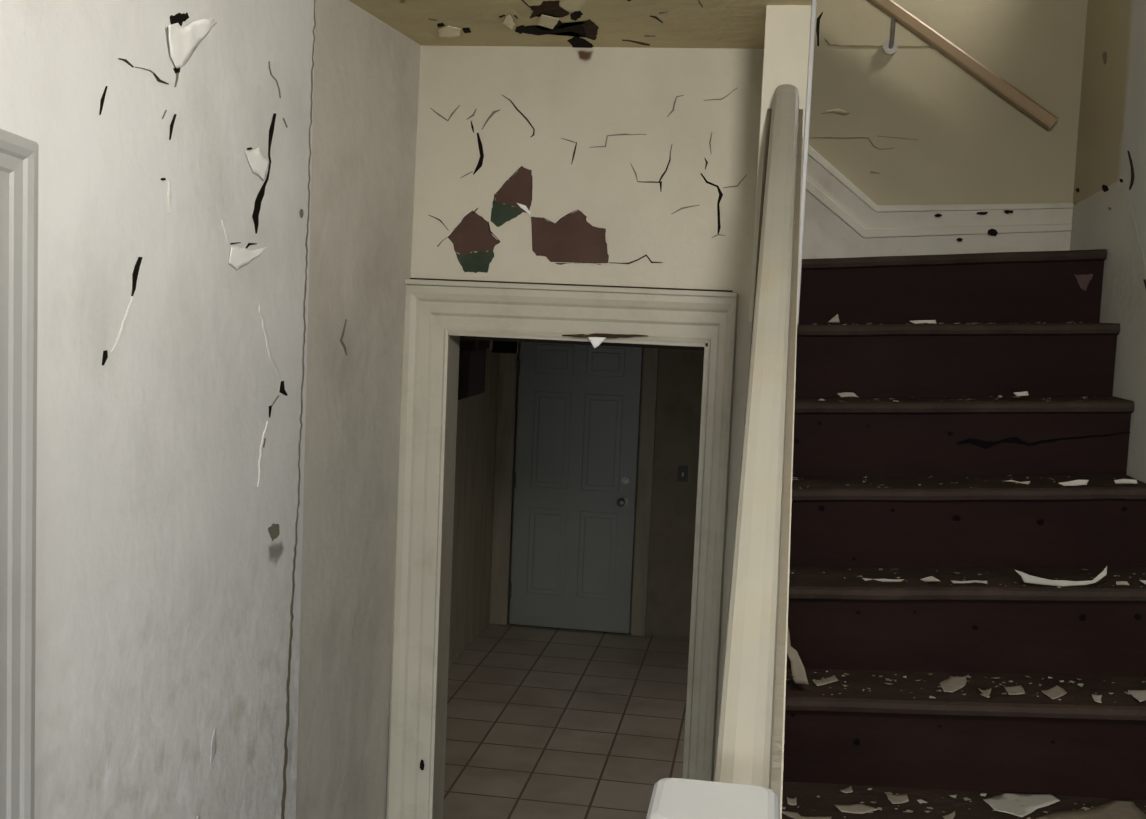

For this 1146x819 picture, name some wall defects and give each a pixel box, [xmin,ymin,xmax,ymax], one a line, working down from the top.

peeling [168,13,217,87]
flaking render [428,18,471,38]
flaking render [499,0,599,48]
crack [667,88,737,117]
crack [430,95,535,178]
crack [561,134,646,164]
crack [630,133,747,238]
peeling [429,166,609,273]
peeling [222,220,267,270]
crack [609,254,663,264]